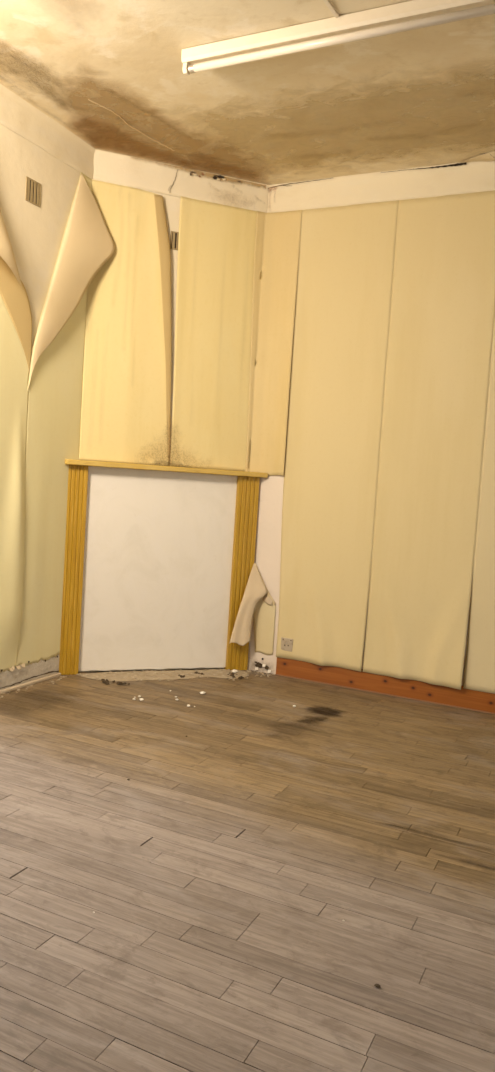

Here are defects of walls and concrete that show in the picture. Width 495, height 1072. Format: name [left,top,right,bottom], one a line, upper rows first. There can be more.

water stain [69,76,495,188]